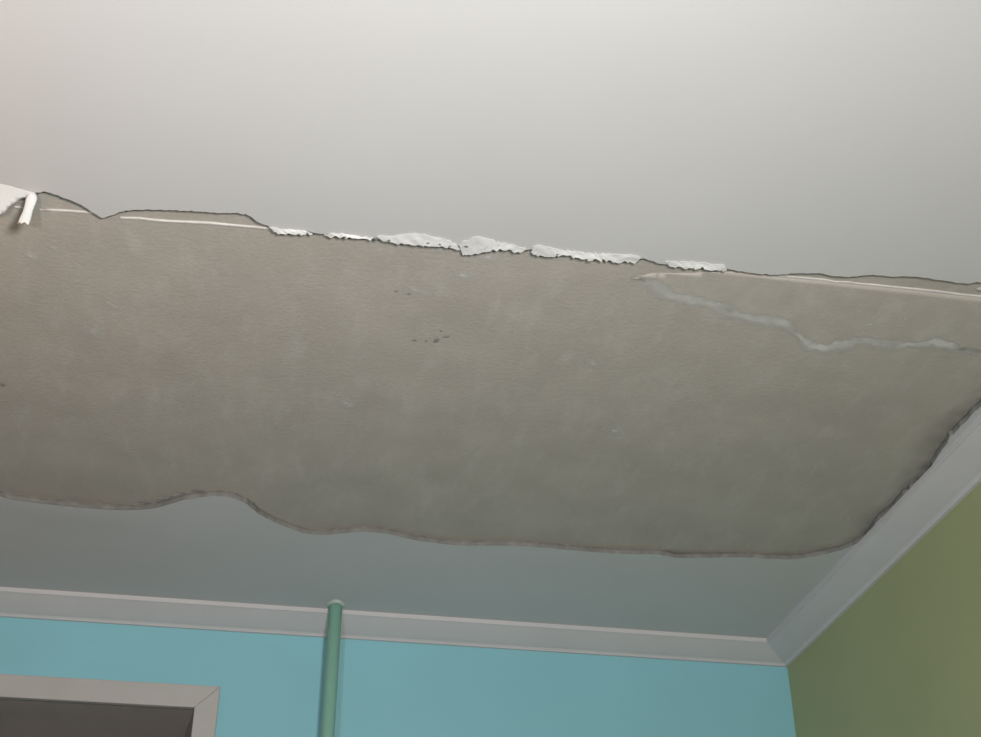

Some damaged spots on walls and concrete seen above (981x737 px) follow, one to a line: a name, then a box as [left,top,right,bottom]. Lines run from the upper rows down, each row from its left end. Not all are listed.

crack [14,206,96,215]
crack [120,217,271,230]
crack [761,274,981,298]
flaking render [0,183,981,560]